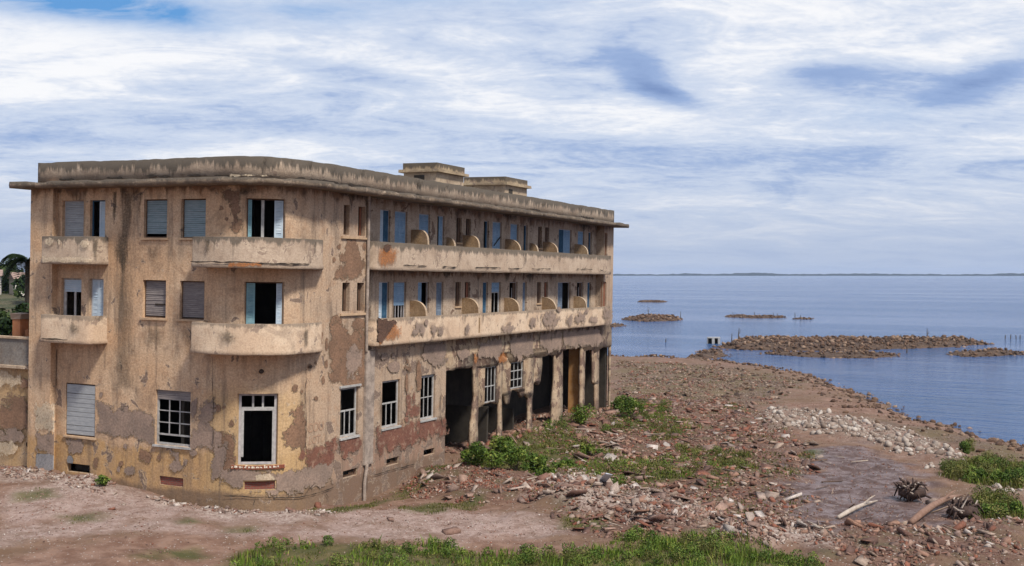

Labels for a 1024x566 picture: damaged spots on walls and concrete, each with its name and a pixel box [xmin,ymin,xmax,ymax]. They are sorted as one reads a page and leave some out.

water stain [113,191,141,266]
peeling [219,187,252,233]
peeling [333,239,367,282]
rust [379,248,396,265]
peeling [0,378,84,455]
flaking render [95,315,397,497]
flaking render [375,305,613,459]